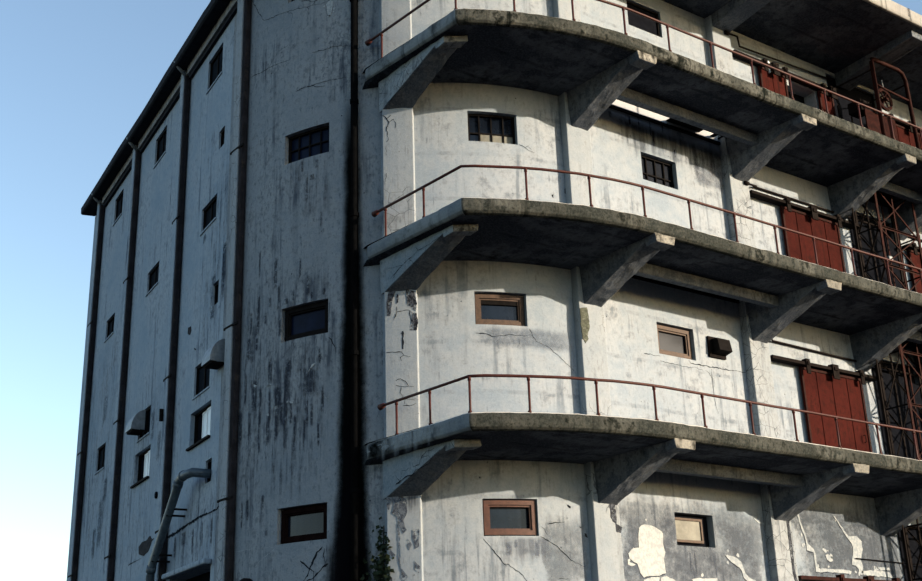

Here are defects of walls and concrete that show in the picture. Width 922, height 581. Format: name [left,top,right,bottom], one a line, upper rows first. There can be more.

leakage [625,116,717,168]
leakage [247,260,312,361]
peeling [386,290,418,330]
leakage [329,125,389,581]
crack [479,330,574,371]
leakage [239,349,324,462]
crack [540,522,585,579]
peeling [628,519,675,581]
peeling [725,549,756,581]